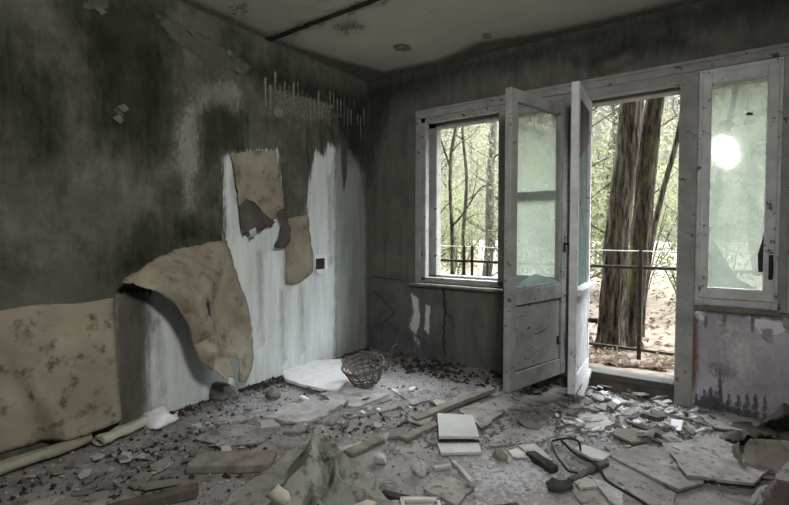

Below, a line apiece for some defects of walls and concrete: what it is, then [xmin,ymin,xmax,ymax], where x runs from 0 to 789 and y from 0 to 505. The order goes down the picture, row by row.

peeling [281,162,289,210]
peeling [410,294,430,357]
peeling [748,313,789,343]
damp [692,305,789,420]